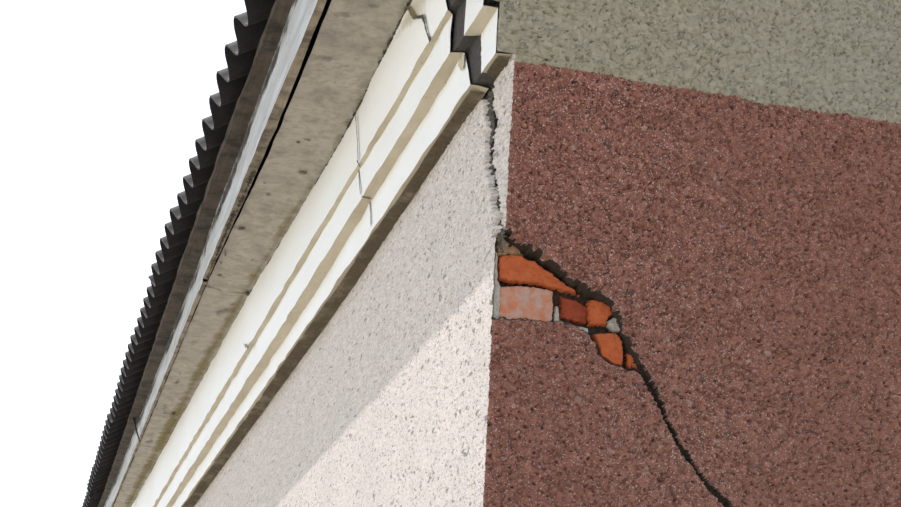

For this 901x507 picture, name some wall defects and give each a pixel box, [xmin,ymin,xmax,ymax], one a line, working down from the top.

flaking render [491,236,638,373]
crack [631,361,732,507]